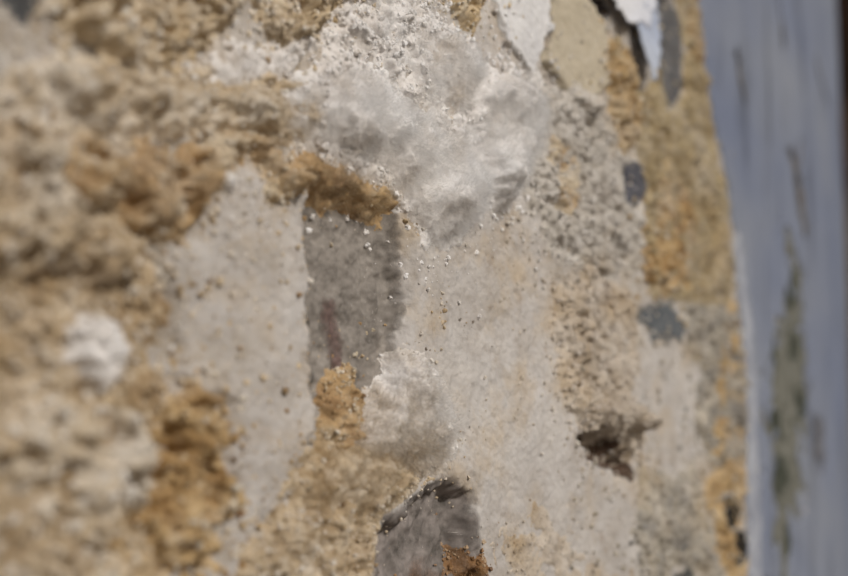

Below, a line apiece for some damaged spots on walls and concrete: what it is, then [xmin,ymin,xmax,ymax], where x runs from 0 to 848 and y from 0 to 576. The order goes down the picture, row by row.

peeling [615,0,662,82]
hole [576,433,634,482]
spalling [375,479,481,576]